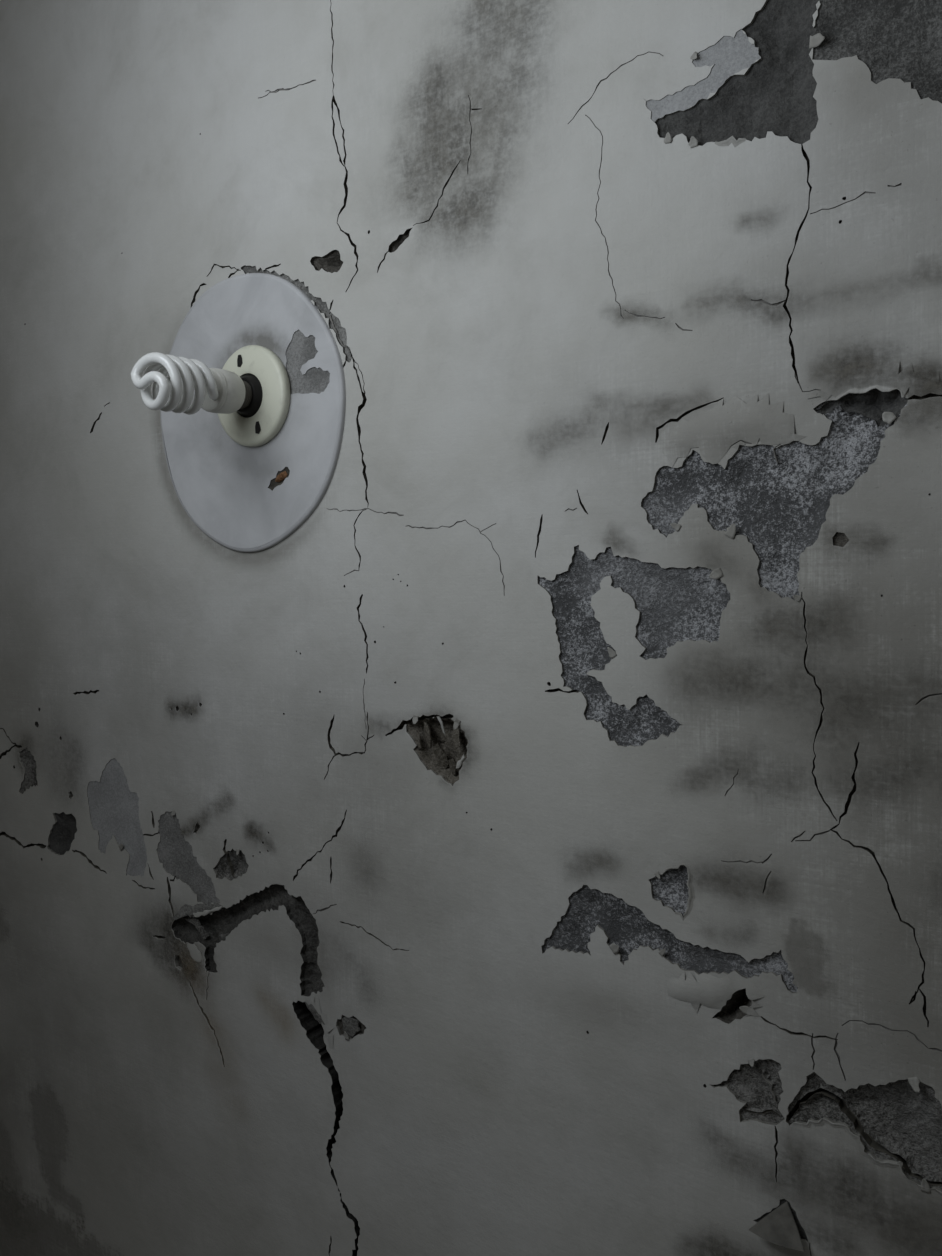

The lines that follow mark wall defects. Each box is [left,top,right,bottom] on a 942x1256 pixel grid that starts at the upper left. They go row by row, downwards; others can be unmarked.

spalling [644,0,942,148]
spalling [310,250,343,273]
crack [751,144,902,392]
rust [268,467,290,491]
crack [191,0,505,780]
crack [655,397,724,443]
spalling [641,389,908,602]
spalling [537,545,730,747]
crack [0,810,409,1256]
spalling [541,885,798,1024]
spalling [703,1058,942,1196]
crack [721,592,942,1186]